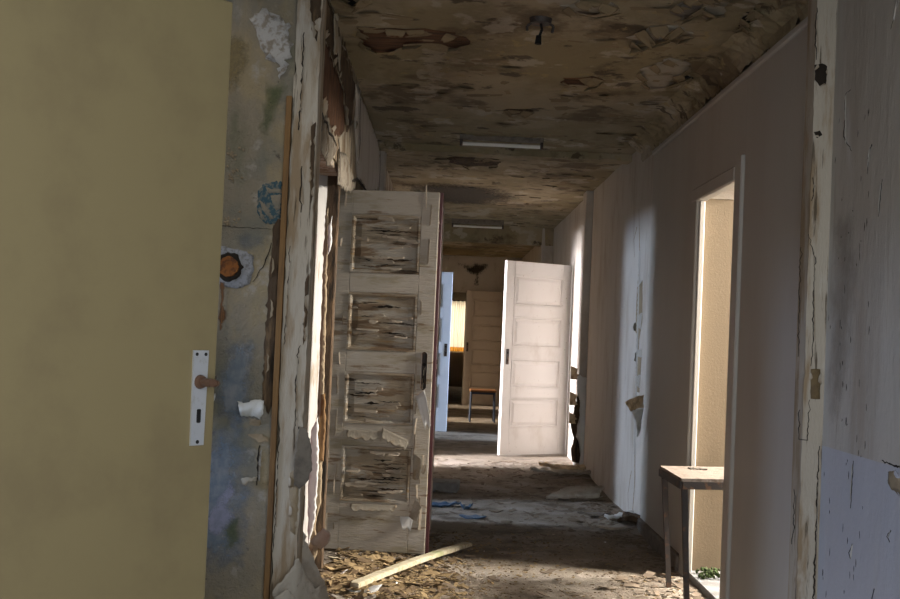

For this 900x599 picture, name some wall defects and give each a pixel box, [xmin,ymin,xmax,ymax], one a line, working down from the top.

peeling [249,8,293,79]
spalling [310,0,378,142]
flaking render [356,28,472,55]
peeling [626,0,732,55]
crack [791,400,820,599]
crack [848,461,856,508]